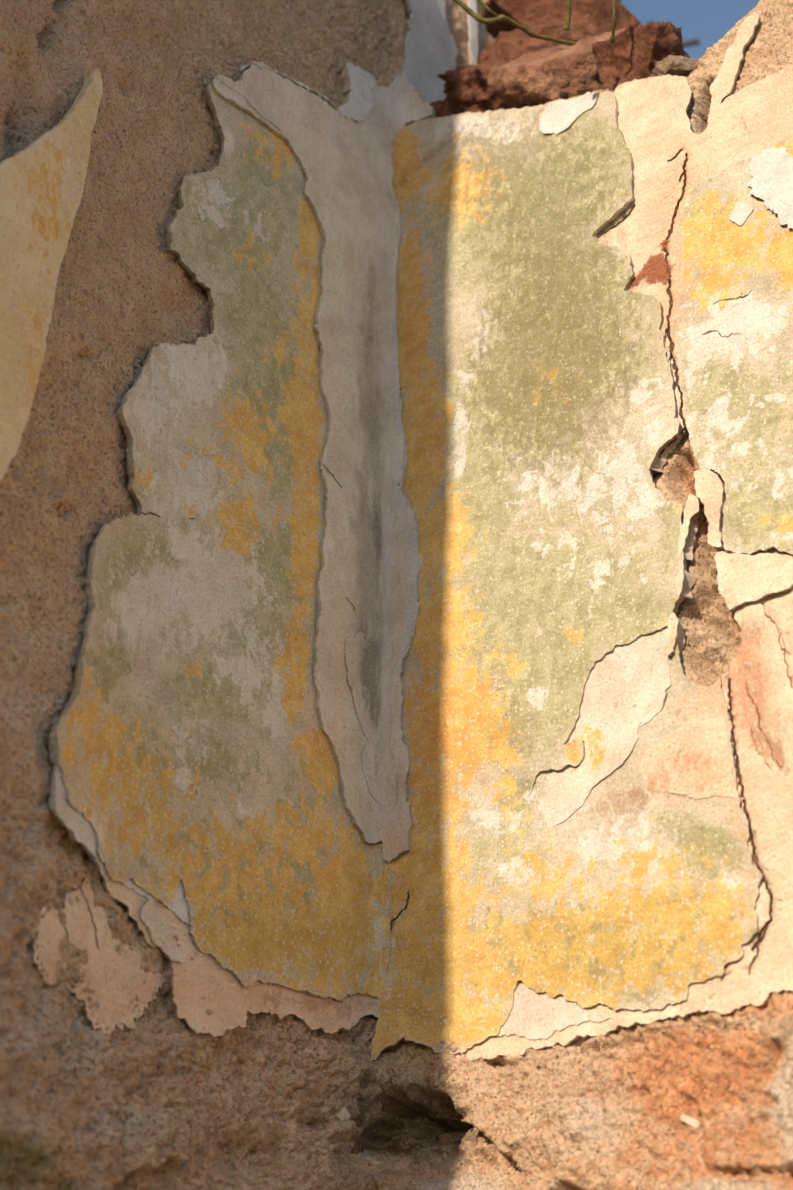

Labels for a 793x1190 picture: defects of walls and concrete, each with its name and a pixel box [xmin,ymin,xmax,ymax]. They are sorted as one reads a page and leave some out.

peeling [466,0,479,65]
peeling [0,69,103,479]
crack [659,149,688,458]
crack [702,290,752,338]
peeling [31,0,458,1037]
peeling [371,11,793,1061]
crack [693,469,715,522]
crack [720,678,783,982]